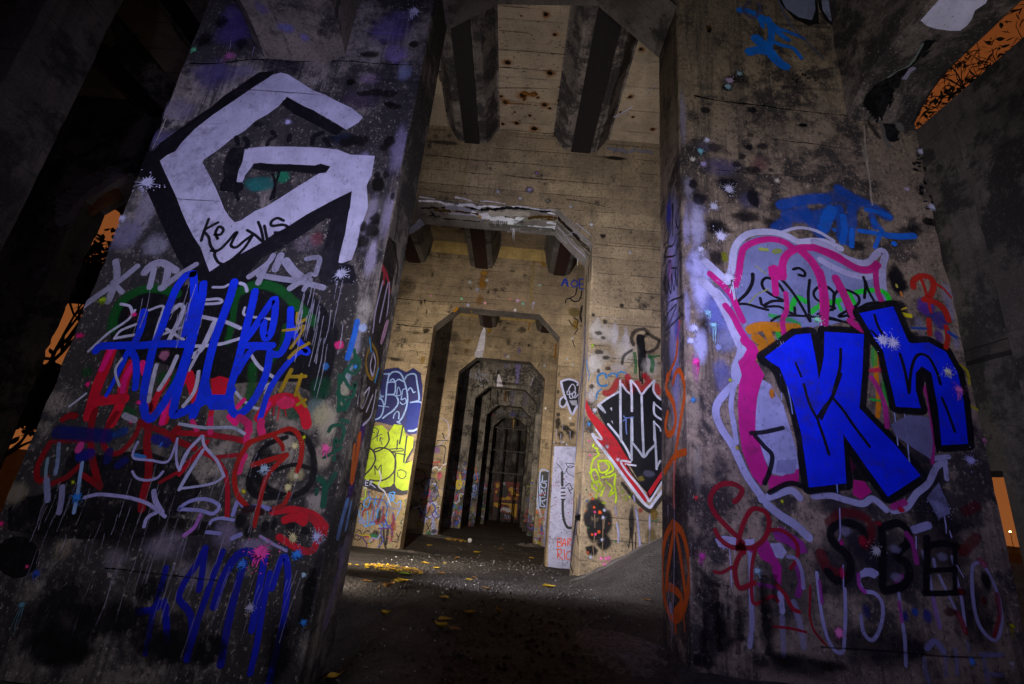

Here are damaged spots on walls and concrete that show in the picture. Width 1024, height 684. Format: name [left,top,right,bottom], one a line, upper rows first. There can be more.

corrosion [499,91,559,131]